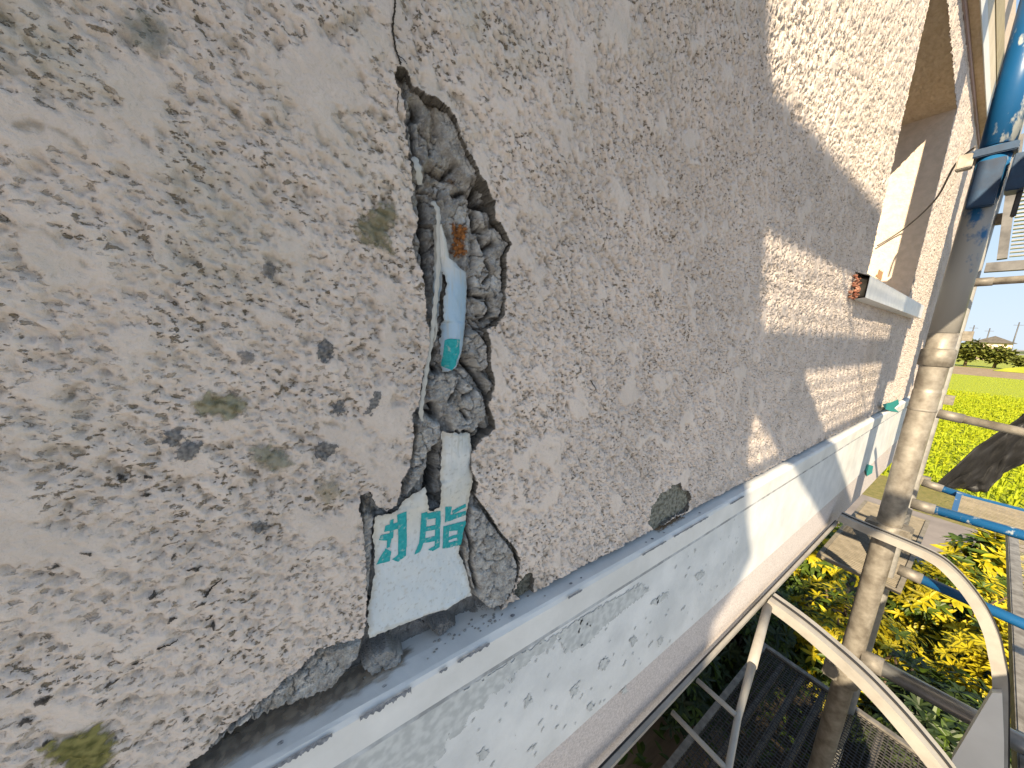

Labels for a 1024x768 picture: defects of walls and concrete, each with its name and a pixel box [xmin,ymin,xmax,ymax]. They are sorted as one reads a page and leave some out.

crack [391,0,407,65]
corrosion [449,222,468,259]
corrosion [848,274,862,300]
spalling [183,66,535,768]
spalling [645,482,701,543]
peeling [342,583,693,768]